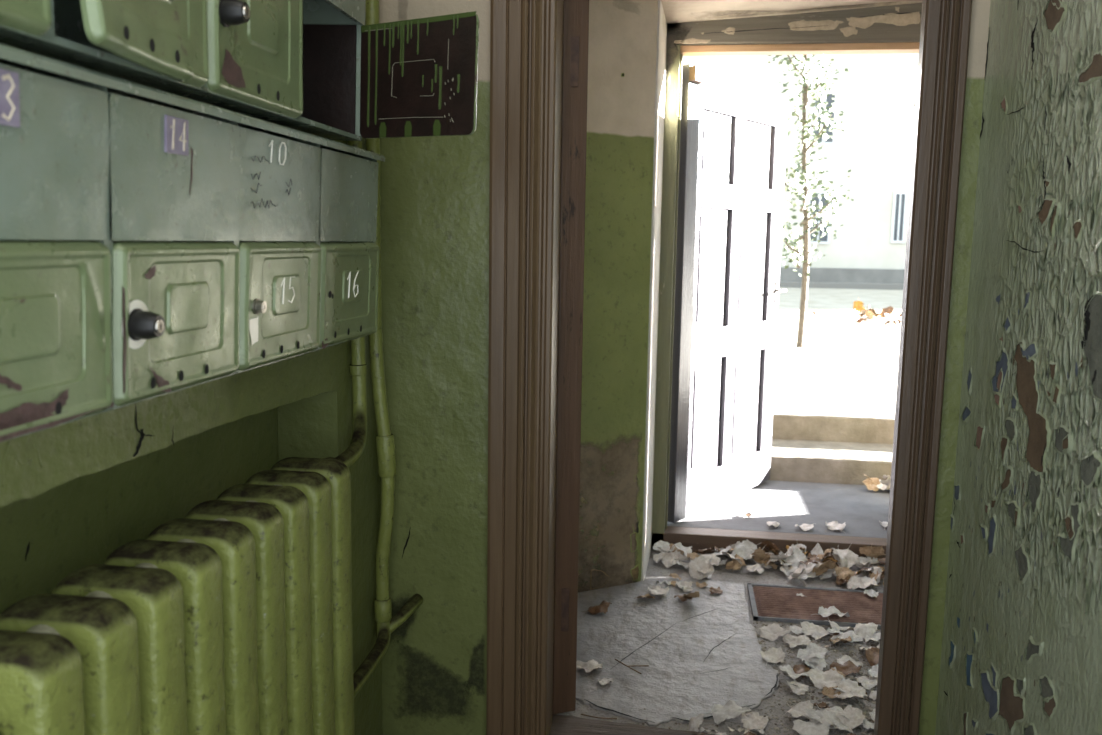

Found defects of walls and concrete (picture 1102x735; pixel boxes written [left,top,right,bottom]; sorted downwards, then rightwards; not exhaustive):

peeling [788,7,920,37]
peeling [1043,0,1067,45]
peeling [1078,46,1102,86]
peeling [1021,178,1084,249]
peeling [950,290,1102,584]
spalling [630,564,640,581]
leakage [392,599,484,715]
peeling [948,616,1057,735]